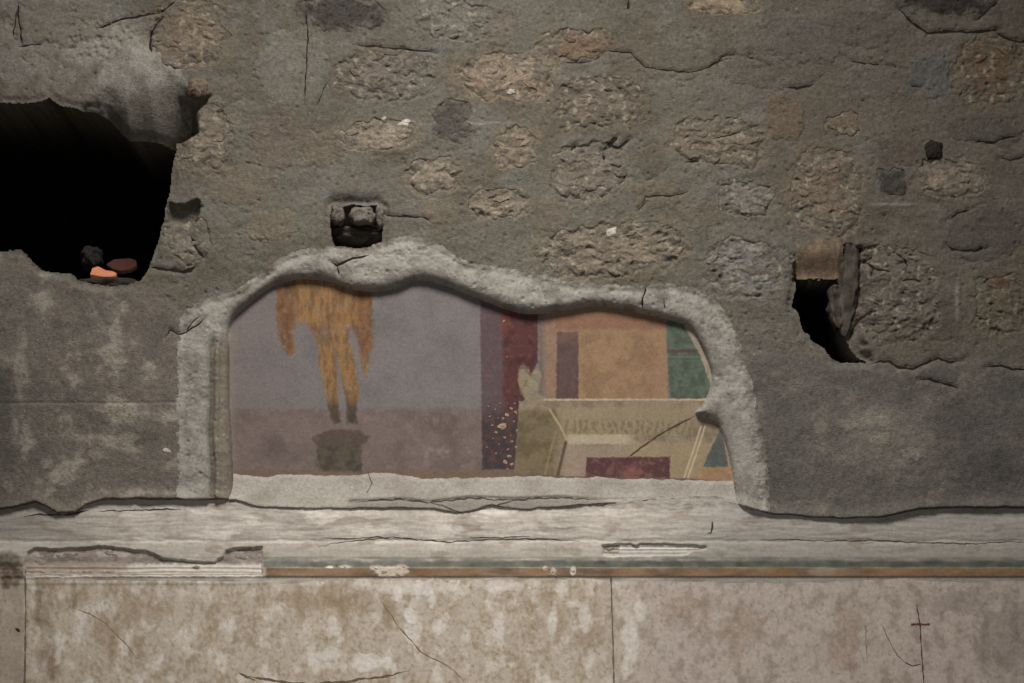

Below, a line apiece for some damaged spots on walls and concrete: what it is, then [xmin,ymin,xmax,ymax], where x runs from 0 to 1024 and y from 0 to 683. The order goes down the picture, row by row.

crack [99,0,176,52]
crack [898,2,1024,43]
crack [304,14,327,104]
crack [566,50,753,73]
spalling [0,97,235,281]
spalling [792,243,942,364]
crack [165,316,205,337]
crack [625,415,695,459]
crack [24,508,177,517]
crack [355,471,599,512]
crack [319,536,574,547]
crack [240,604,465,683]